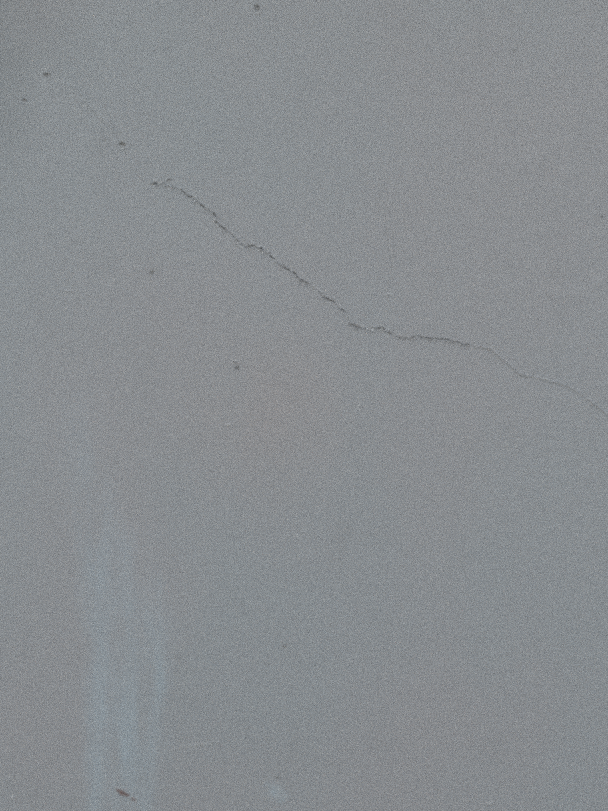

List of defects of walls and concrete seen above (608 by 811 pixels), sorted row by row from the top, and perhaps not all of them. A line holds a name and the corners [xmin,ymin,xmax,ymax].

crack [51,77,608,417]